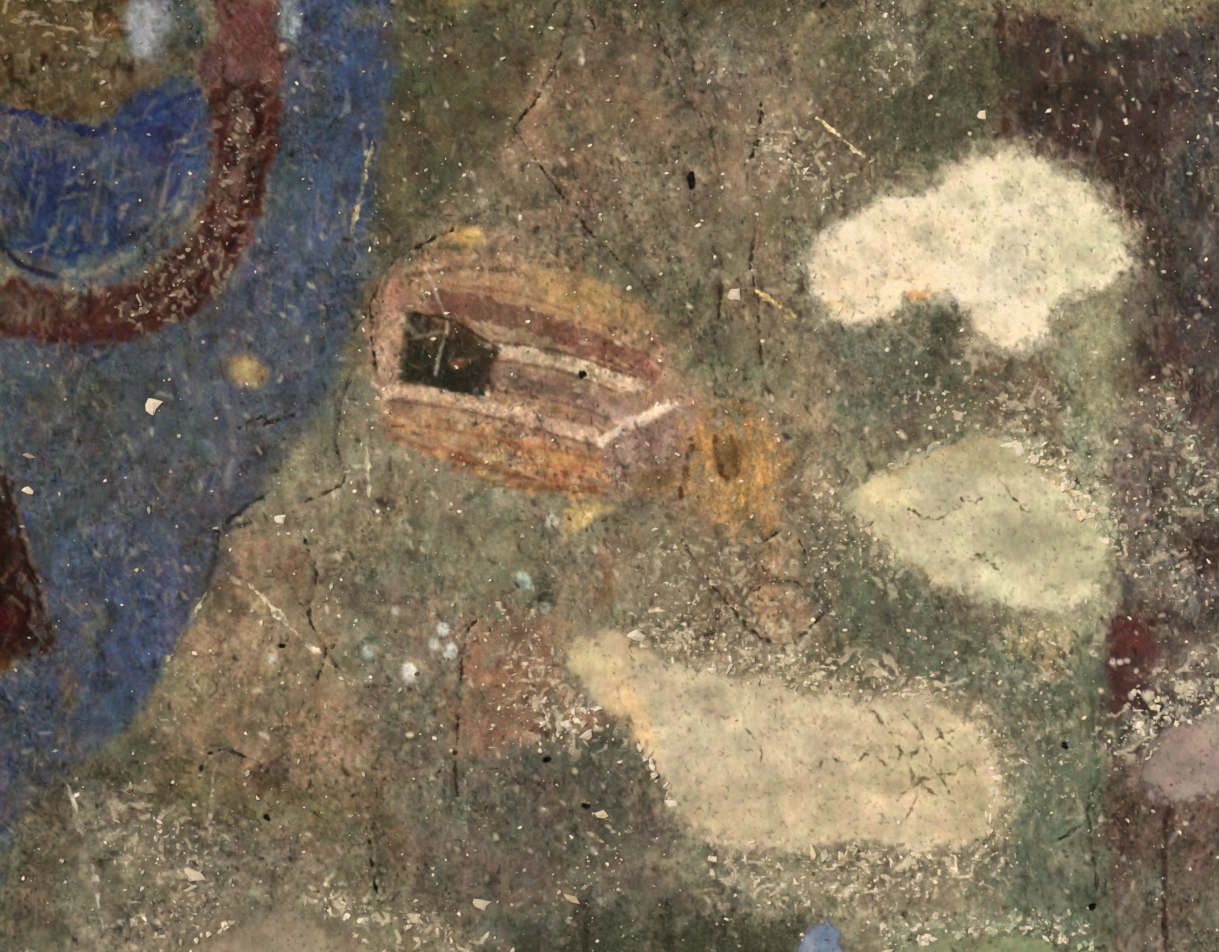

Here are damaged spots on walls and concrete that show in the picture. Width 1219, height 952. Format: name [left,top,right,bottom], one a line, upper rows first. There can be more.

crack [513,0,562,130]
crack [535,158,618,260]
crack [215,495,264,550]
spalling [470,380,1219,952]